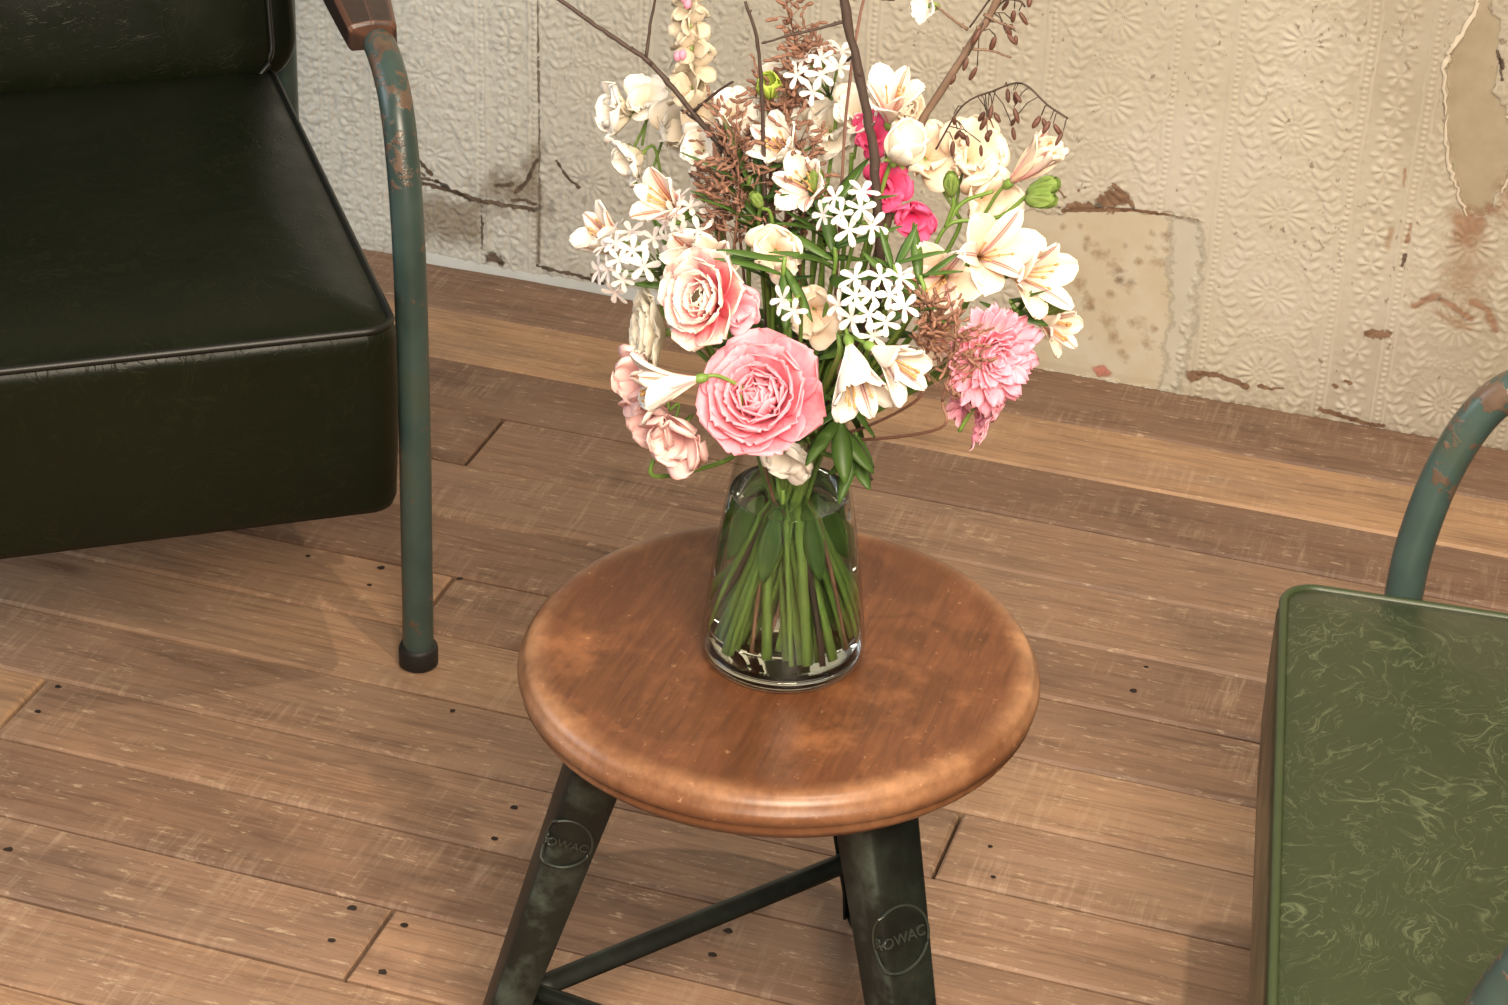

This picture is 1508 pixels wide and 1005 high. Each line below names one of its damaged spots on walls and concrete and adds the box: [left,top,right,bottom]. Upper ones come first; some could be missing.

crack [420,2,606,285]
peeling [1441,0,1508,216]
spalling [1019,183,1284,395]